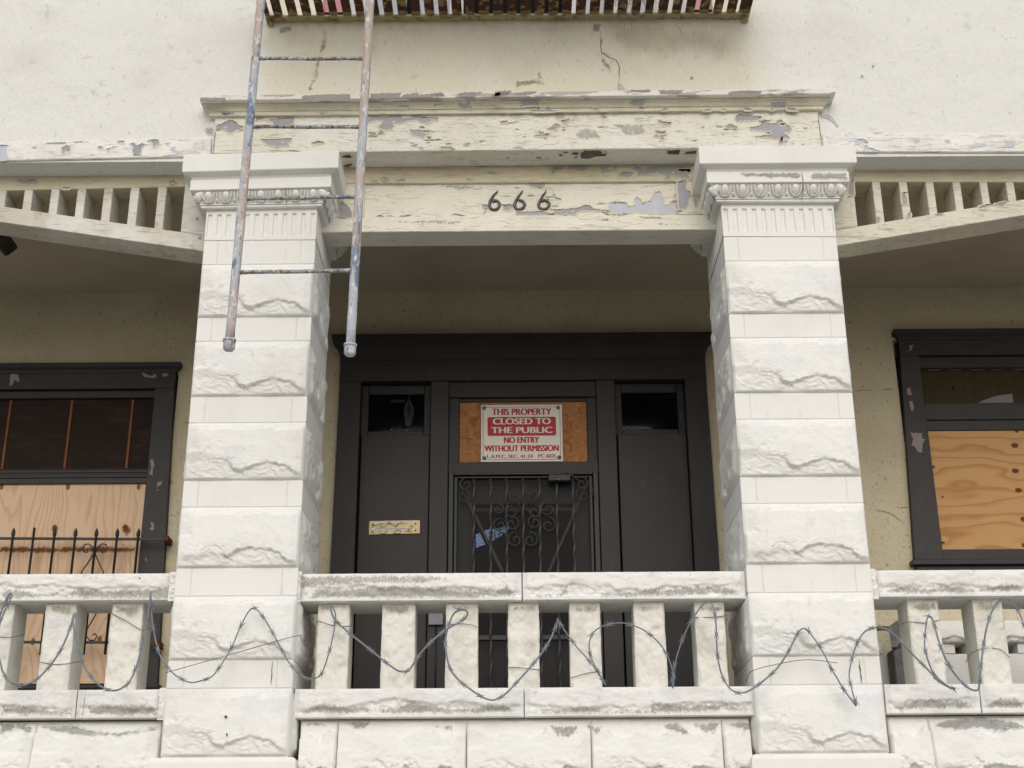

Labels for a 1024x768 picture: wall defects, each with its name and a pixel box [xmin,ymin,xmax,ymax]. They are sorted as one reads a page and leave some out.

peeling [618,83,683,111]
peeling [367,92,472,151]
peeling [457,90,571,138]
peeling [702,90,808,145]
peeling [0,144,9,161]
peeling [34,141,83,155]
peeling [97,138,177,156]
peeling [502,107,699,225]
peeling [337,201,353,219]